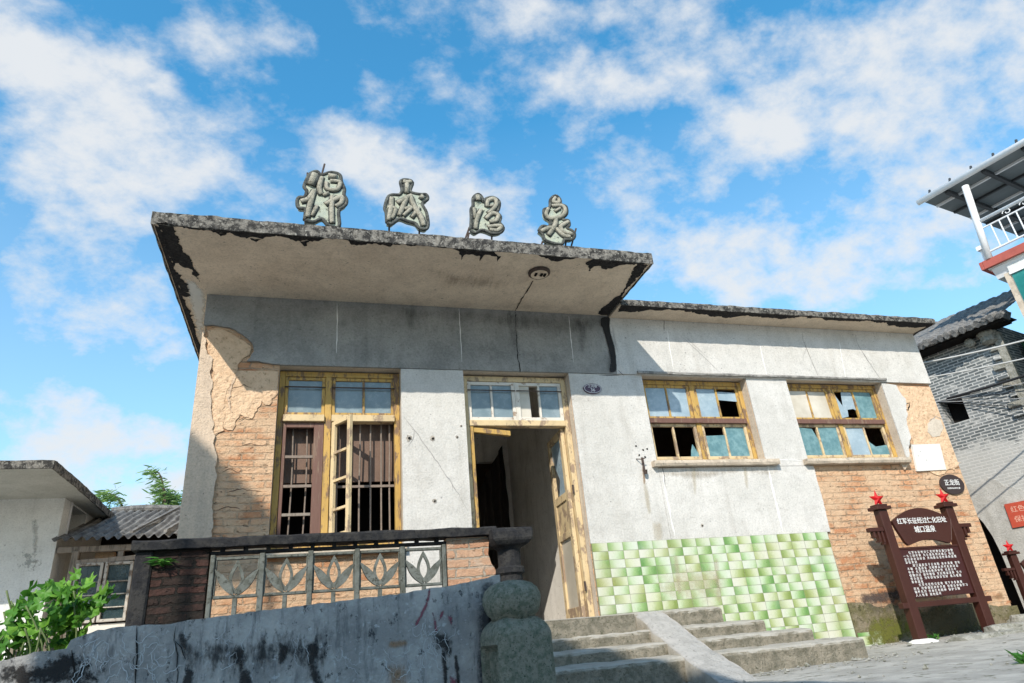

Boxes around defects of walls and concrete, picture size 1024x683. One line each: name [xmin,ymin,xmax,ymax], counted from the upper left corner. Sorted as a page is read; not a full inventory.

peeling [343,239,416,247]
peeling [452,248,501,261]
peeling [539,255,934,334]
spalling [155,222,324,435]
crack [515,281,533,371]
leakage [601,317,617,372]
spalling [927,416,945,437]
crack [71,627,186,683]
leakage [179,632,325,683]
crack [292,619,456,681]